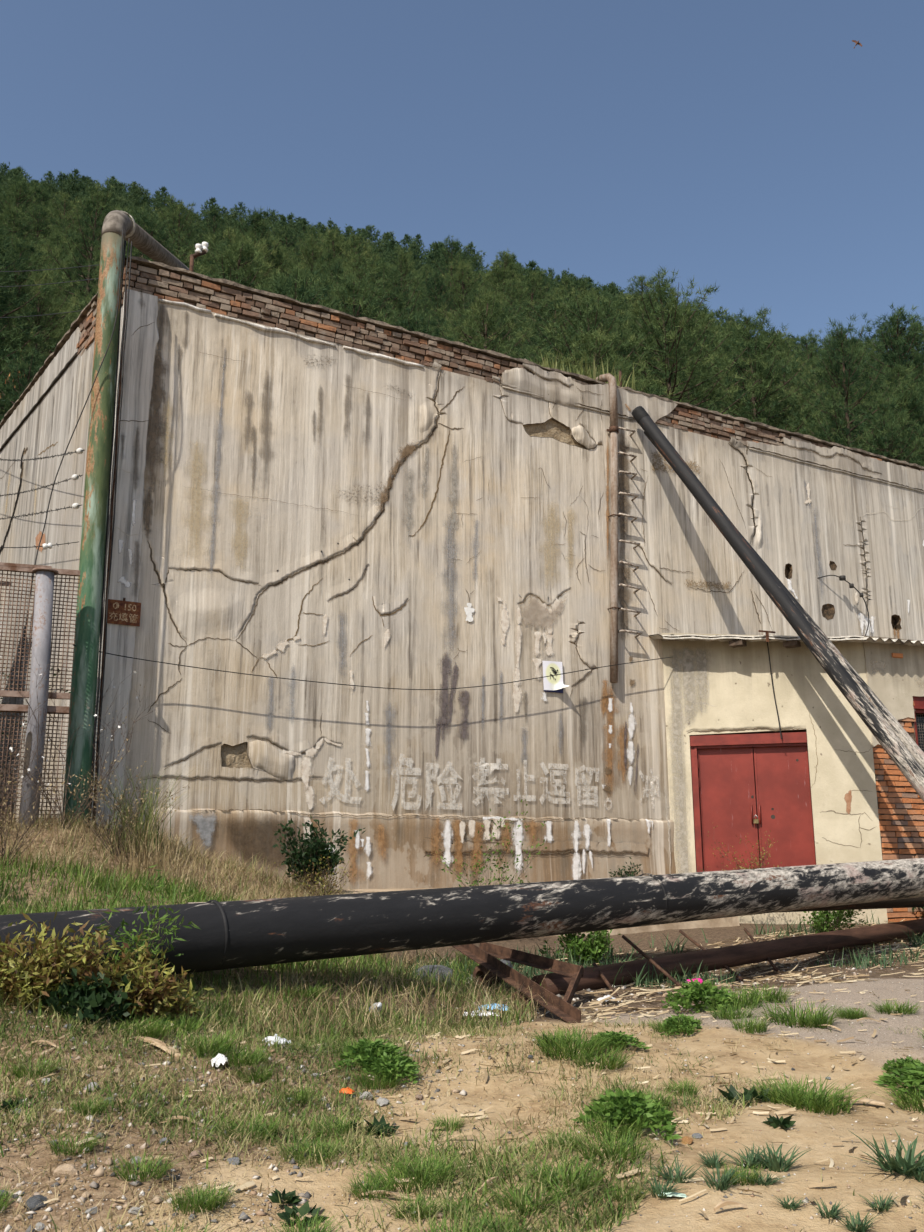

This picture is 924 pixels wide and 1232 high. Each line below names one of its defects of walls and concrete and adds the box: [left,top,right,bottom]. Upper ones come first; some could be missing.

crack [0,442,58,554]
damp [118,306,187,593]
crack [138,359,671,866]
flaking render [523,417,588,450]
damp [618,437,630,543]
crack [630,436,772,631]
crack [783,437,882,475]
crack [843,516,872,616]
damp [435,653,485,758]
flaking render [221,742,277,782]
damp [442,816,524,871]
damp [572,821,593,880]